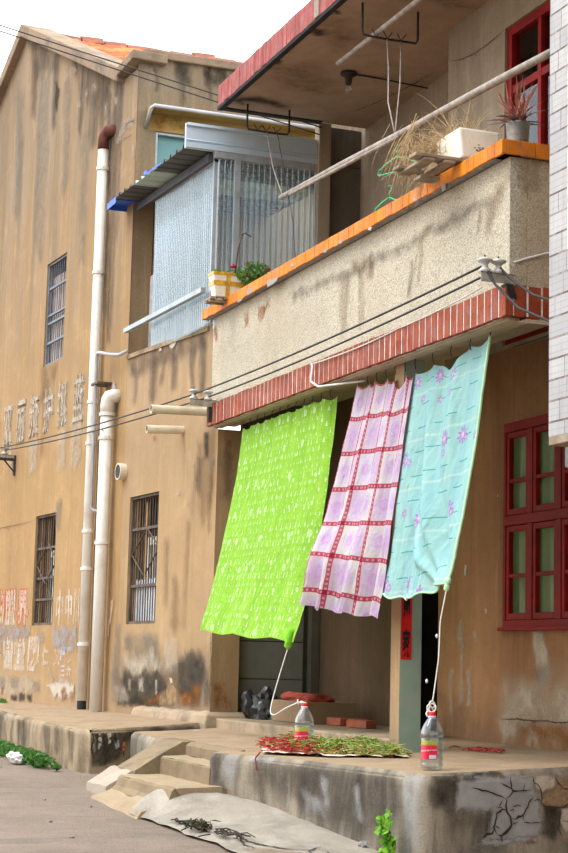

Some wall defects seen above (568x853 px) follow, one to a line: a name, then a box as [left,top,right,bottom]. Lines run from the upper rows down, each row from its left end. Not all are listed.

water stain [39,78,59,142]
water stain [75,62,122,196]
peeling [47,671,74,699]
spalling [160,678,176,704]
crack [502,717,568,725]
spalling [91,730,134,765]
crack [475,776,568,843]